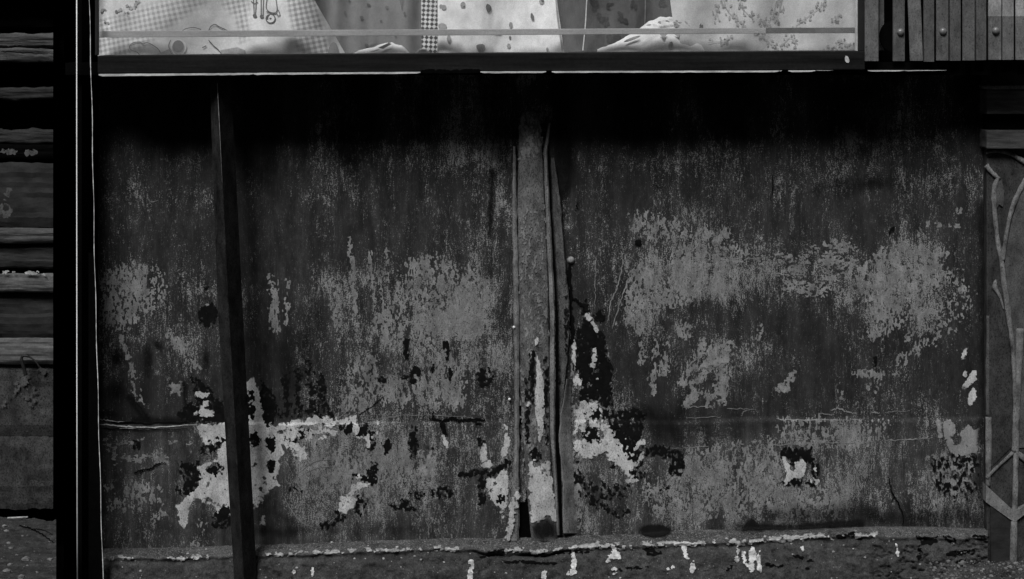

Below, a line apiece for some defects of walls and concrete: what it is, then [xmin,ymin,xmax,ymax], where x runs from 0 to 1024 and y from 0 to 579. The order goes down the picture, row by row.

leakage [550,75,572,201]
peeling [621,207,978,410]
peeling [247,204,891,572]
peeling [925,419,980,502]
spalling [916,534,989,564]